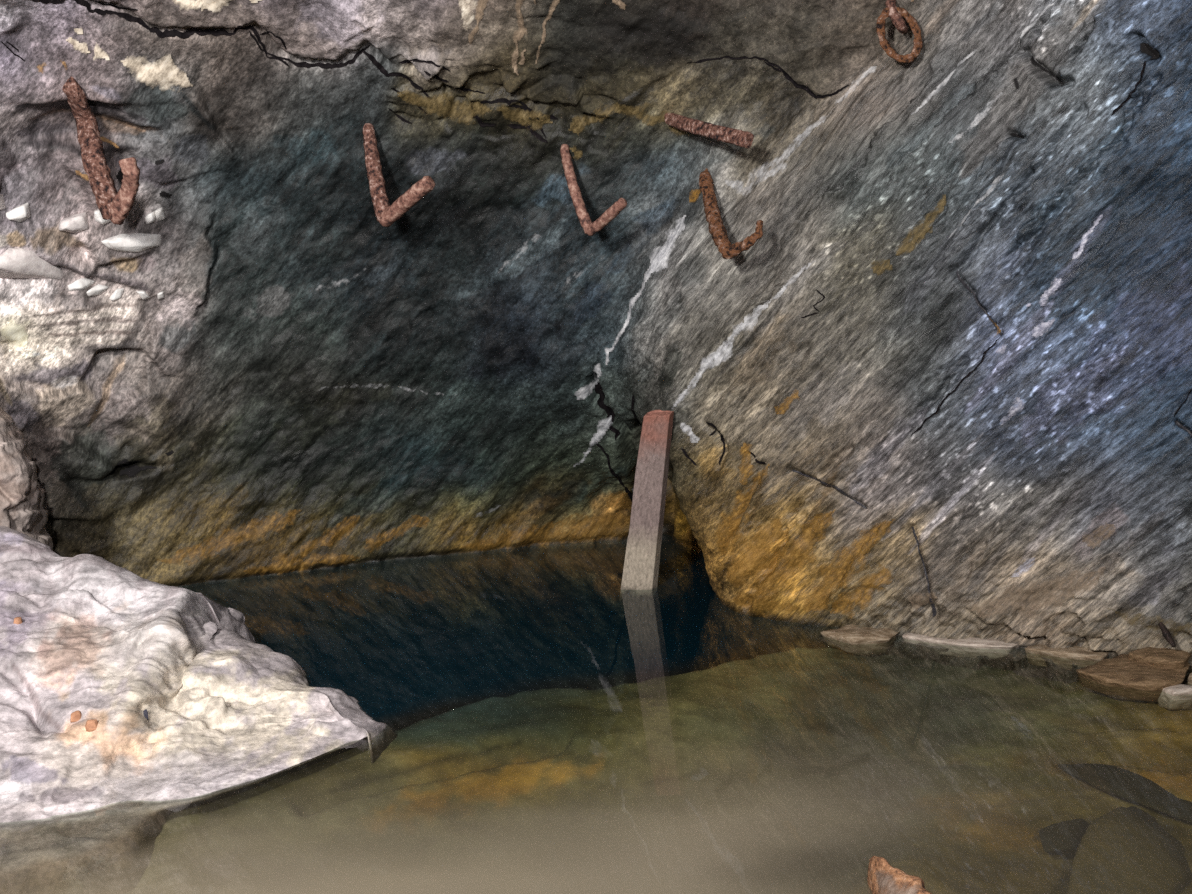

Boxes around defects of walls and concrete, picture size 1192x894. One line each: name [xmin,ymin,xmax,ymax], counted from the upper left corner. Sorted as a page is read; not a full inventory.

crack [1,41,25,61]
crack [31,0,558,143]